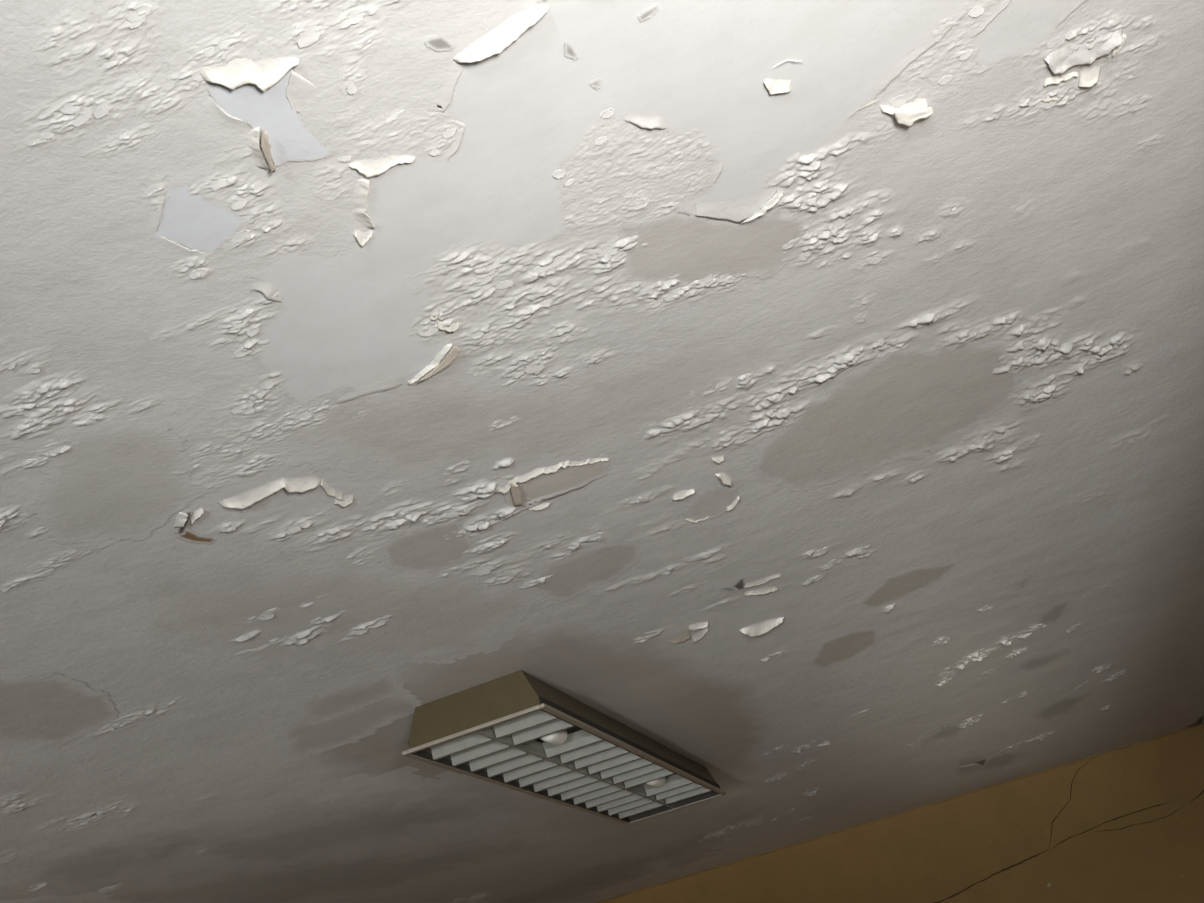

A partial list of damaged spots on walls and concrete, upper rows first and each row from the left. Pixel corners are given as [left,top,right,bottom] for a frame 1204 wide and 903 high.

peeling [198,57,332,173]
peeling [1040,28,1127,102]
peeling [240,0,977,405]
damp [251,317,784,499]
flaking render [383,520,475,573]
peeling [495,458,610,510]
damp [0,544,794,903]
crack [928,757,1204,903]